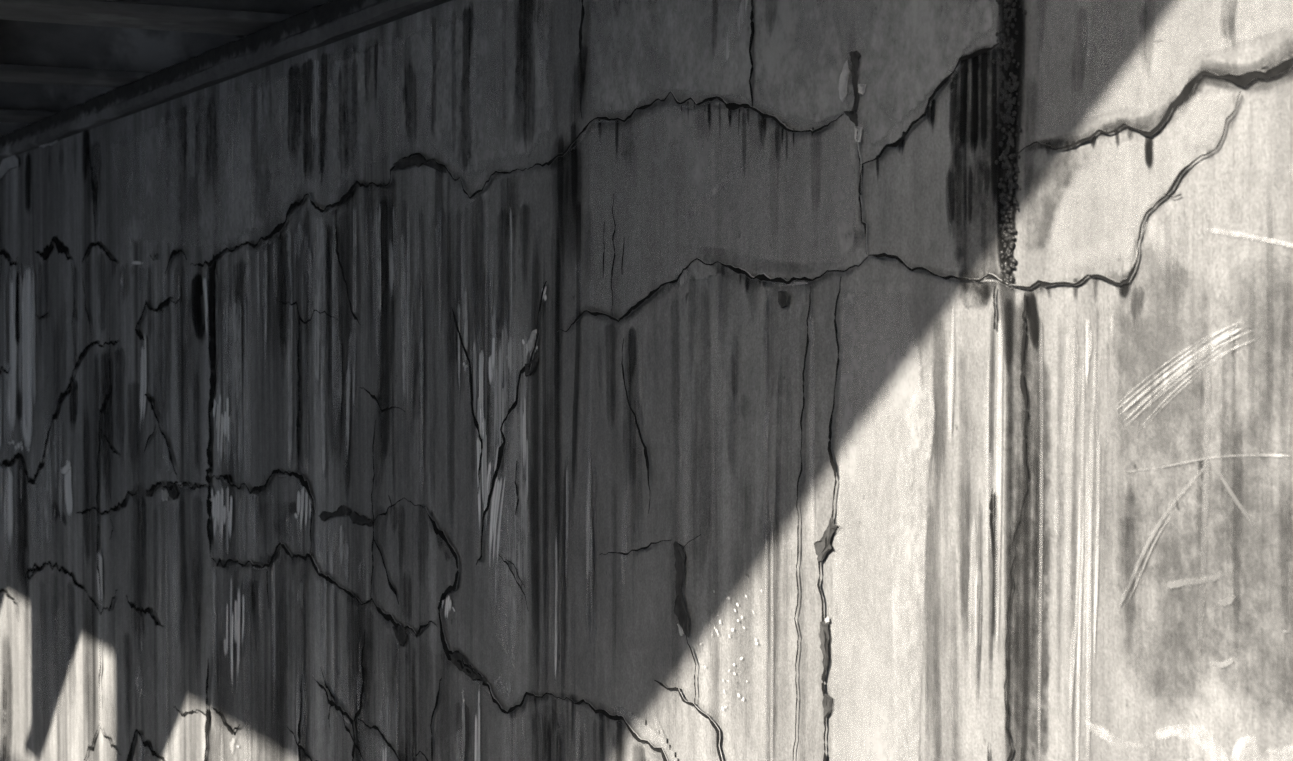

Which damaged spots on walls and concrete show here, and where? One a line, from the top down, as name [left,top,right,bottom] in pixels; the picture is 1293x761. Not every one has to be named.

leakage [1046,136,1095,184]
leakage [1114,128,1152,167]
leakage [0,260,147,600]
leakage [112,0,580,682]
crack [0,0,843,761]
leakage [578,0,1048,752]
crack [558,43,1293,761]
leakage [1119,283,1134,313]
leakage [322,525,390,761]
leakage [456,691,480,761]
leakage [600,713,643,761]
leakage [1087,554,1098,637]